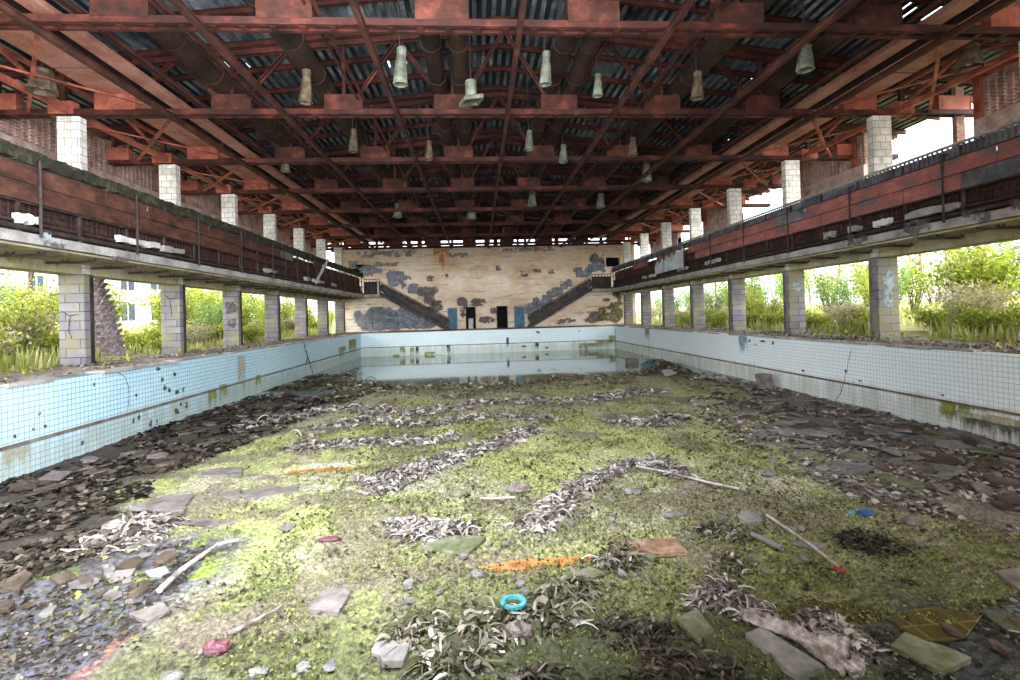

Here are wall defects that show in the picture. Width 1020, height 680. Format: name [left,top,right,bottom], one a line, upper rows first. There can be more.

spalling [40,232,65,250]
peeling [348,261,448,332]
peeling [521,253,606,315]
peeling [882,267,895,307]
peeling [557,311,603,332]
peeling [156,367,188,414]
leakage [944,405,1020,441]